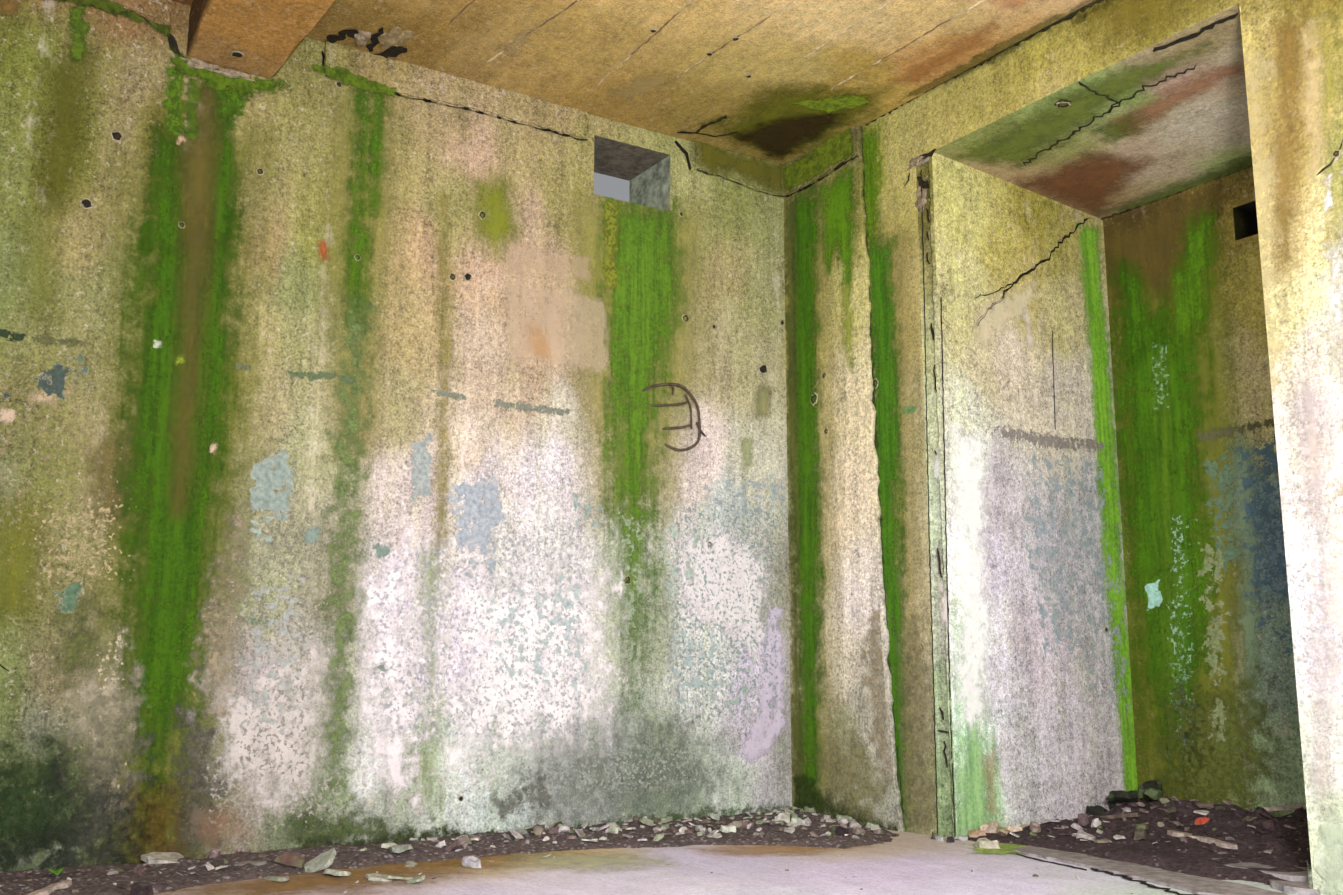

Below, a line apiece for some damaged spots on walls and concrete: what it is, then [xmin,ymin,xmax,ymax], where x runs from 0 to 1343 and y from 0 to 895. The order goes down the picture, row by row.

leakage [0,63,250,871]
leakage [491,131,937,834]
crack [920,169,956,837]
crack [975,171,1239,328]
leakage [1104,180,1282,811]